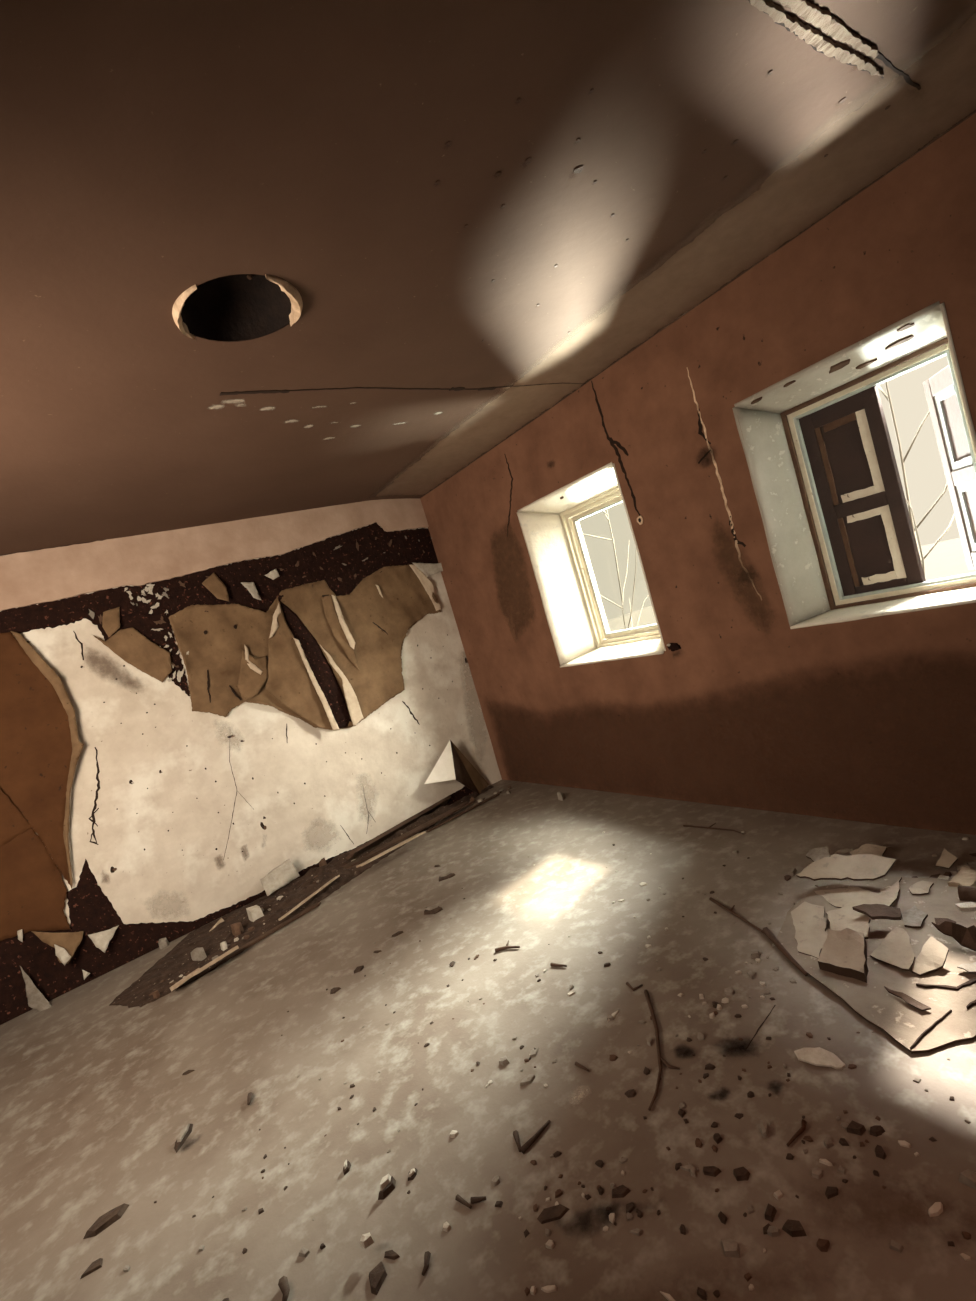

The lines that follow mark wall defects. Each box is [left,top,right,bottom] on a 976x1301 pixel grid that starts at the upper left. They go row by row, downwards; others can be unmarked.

crack [748,0,921,90]
crack [220,381,640,516]
crack [505,456,513,534]
crack [687,367,762,600]
spalling [0,522,443,696]
spalling [432,786,474,813]
spalling [0,859,267,1025]
spalling [297,840,370,878]
peeling [424,905,443,915]
peeling [434,865,455,882]